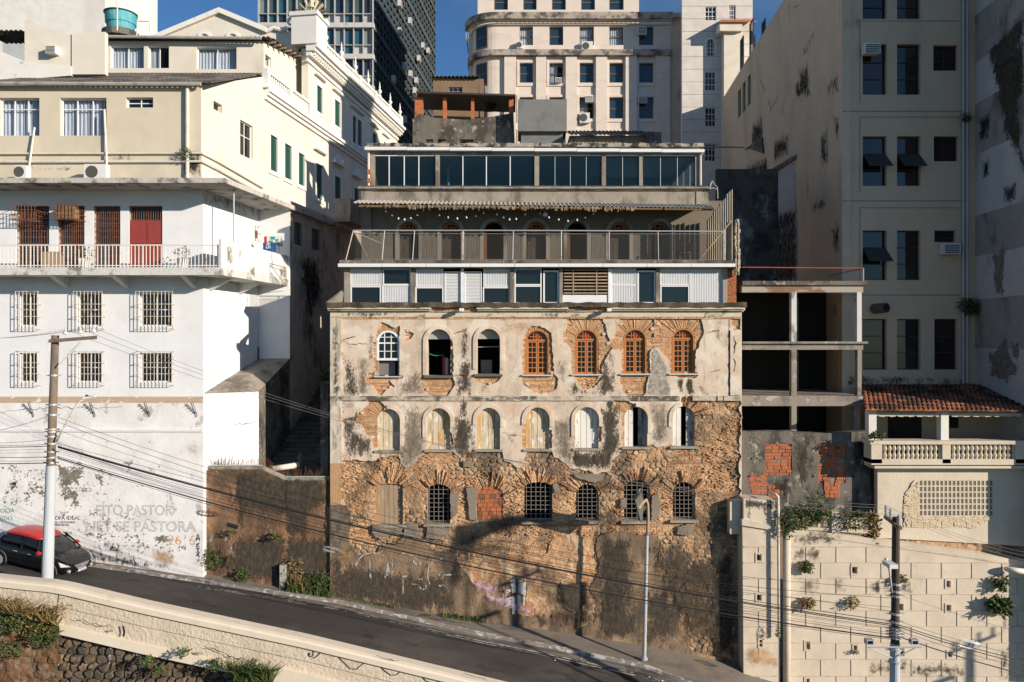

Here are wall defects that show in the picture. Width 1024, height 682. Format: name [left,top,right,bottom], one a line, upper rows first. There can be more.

mould [751,119,763,143]
mould [773,136,788,159]
mould [796,35,813,96]
leakage [978,16,1024,170]
leakage [343,411,423,464]
leakage [453,328,484,457]
leakage [555,356,621,471]
peeling [1,463,186,563]
spalling [341,319,776,663]
spalling [903,482,994,528]